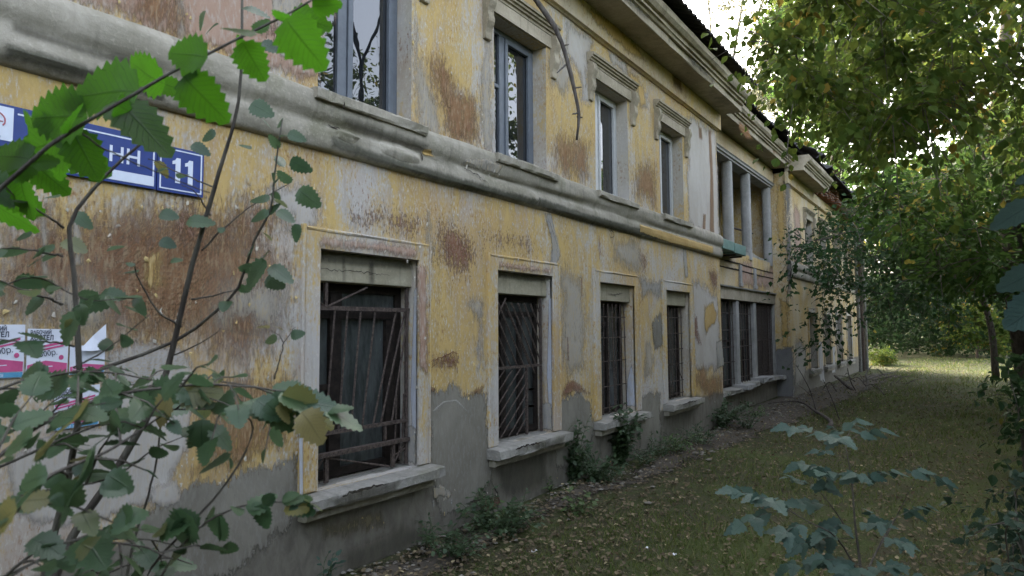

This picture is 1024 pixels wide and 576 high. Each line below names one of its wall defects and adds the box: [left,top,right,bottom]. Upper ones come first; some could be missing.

leakage [333,137,657,239]
peeling [0,181,594,576]
peeling [644,315,663,378]
peeling [683,266,722,405]